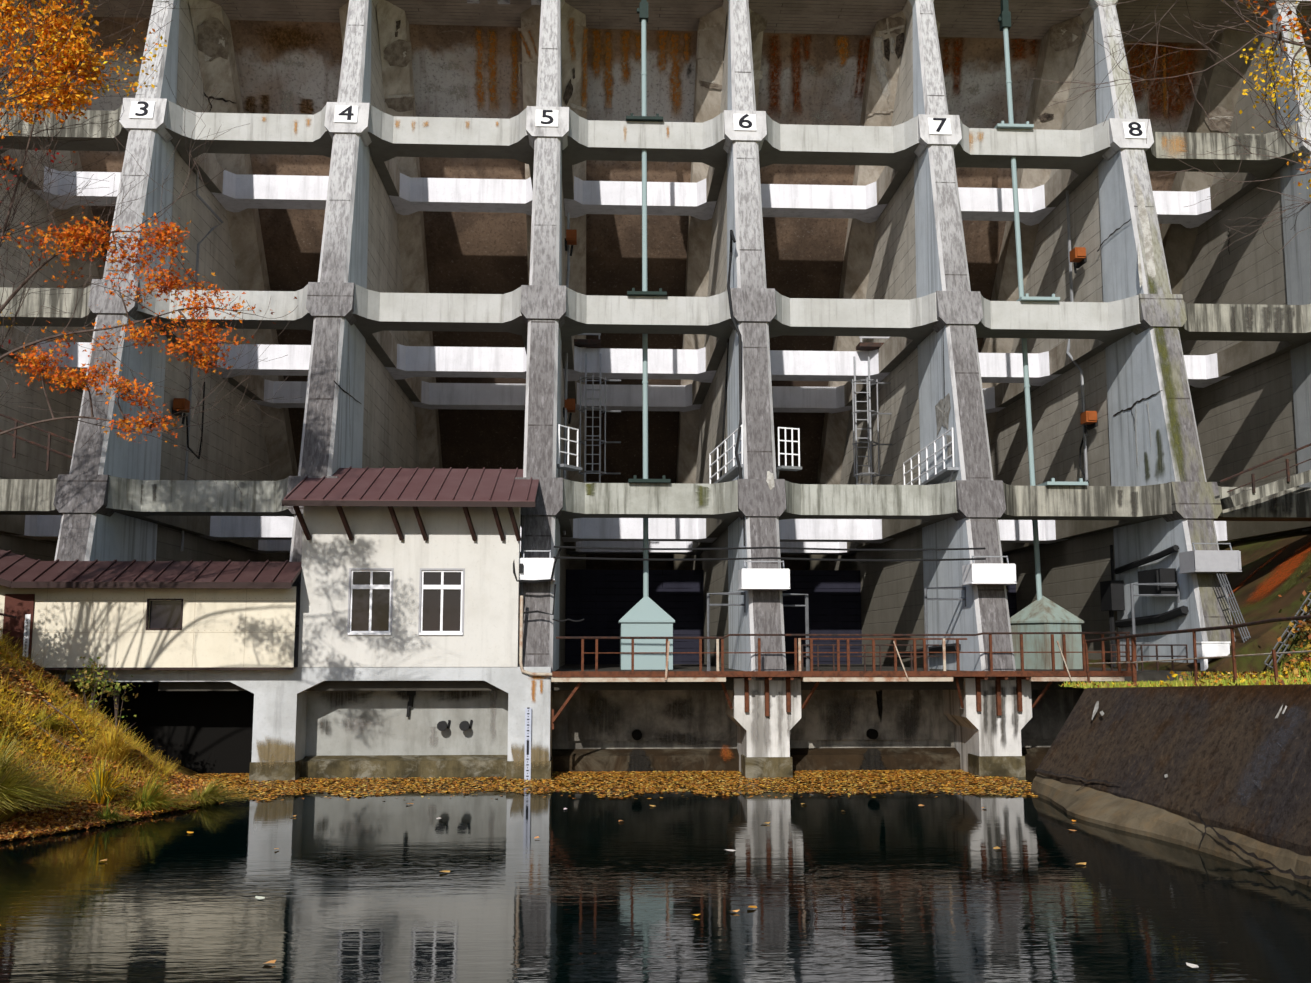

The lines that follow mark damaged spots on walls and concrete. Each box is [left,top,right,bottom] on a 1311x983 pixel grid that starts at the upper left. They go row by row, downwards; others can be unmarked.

spalling [384,20,412,67]
spalling [385,93,415,112]
rust [475,29,537,107]
rust [568,19,641,104]
rust [658,31,691,109]
rust [768,35,811,113]
rust [837,37,870,98]
rust [1128,41,1197,118]
crack [1097,219,1131,252]
crack [1113,390,1162,431]
crack [1193,809,1311,879]